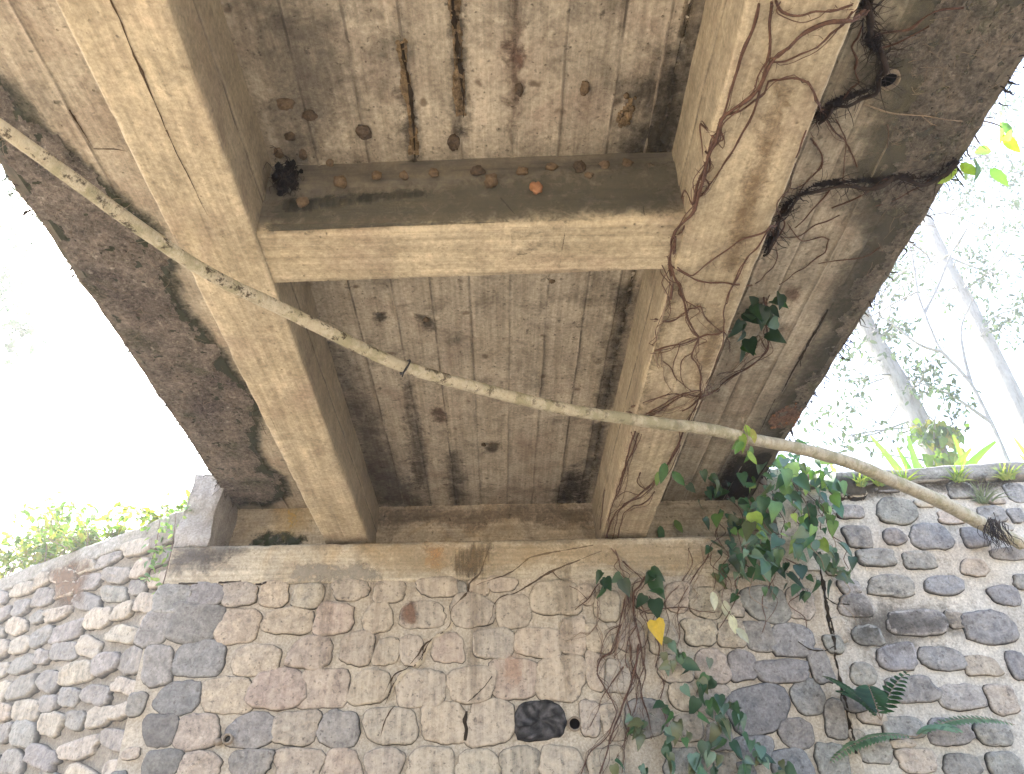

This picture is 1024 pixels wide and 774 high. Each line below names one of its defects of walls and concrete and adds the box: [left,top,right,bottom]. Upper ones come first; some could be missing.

water stain [48,210,76,241]
water stain [0,76,164,235]
crack [110,0,205,210]
crack [400,43,415,157]
crack [451,0,465,117]
water stain [271,24,700,232]
water stain [142,259,292,507]
water stain [554,426,603,504]
water stain [595,287,632,407]
spalling [768,403,802,429]
crack [381,545,601,741]
crack [798,539,858,754]